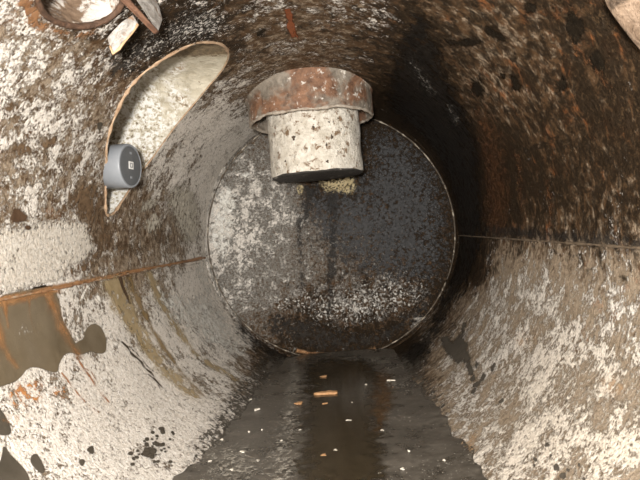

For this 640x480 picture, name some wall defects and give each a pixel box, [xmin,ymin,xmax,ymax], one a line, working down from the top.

rust [9,381,43,407]
peeling [0,220,106,386]
rust [0,257,203,304]
crack [121,341,162,387]
water stain [102,276,203,398]
water stain [147,262,303,480]
peeling [440,322,495,394]
spalling [128,427,175,466]